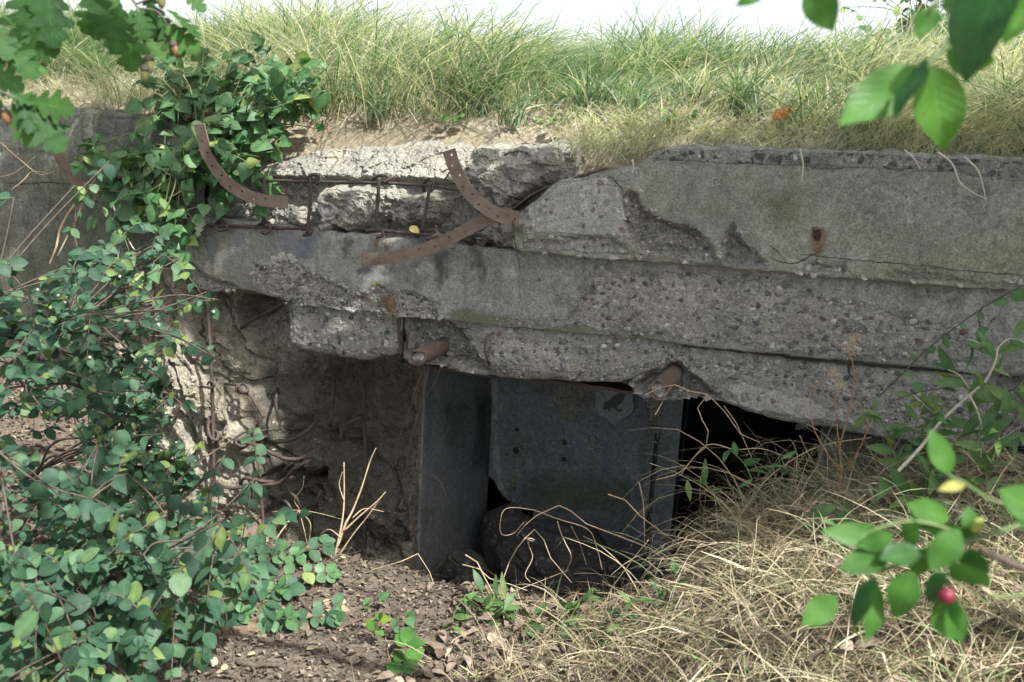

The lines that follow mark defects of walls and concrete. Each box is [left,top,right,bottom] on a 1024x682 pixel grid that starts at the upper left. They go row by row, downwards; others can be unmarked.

spalling [204,159,487,247]
spalling [249,177,1015,443]
crack [769,245,1022,328]